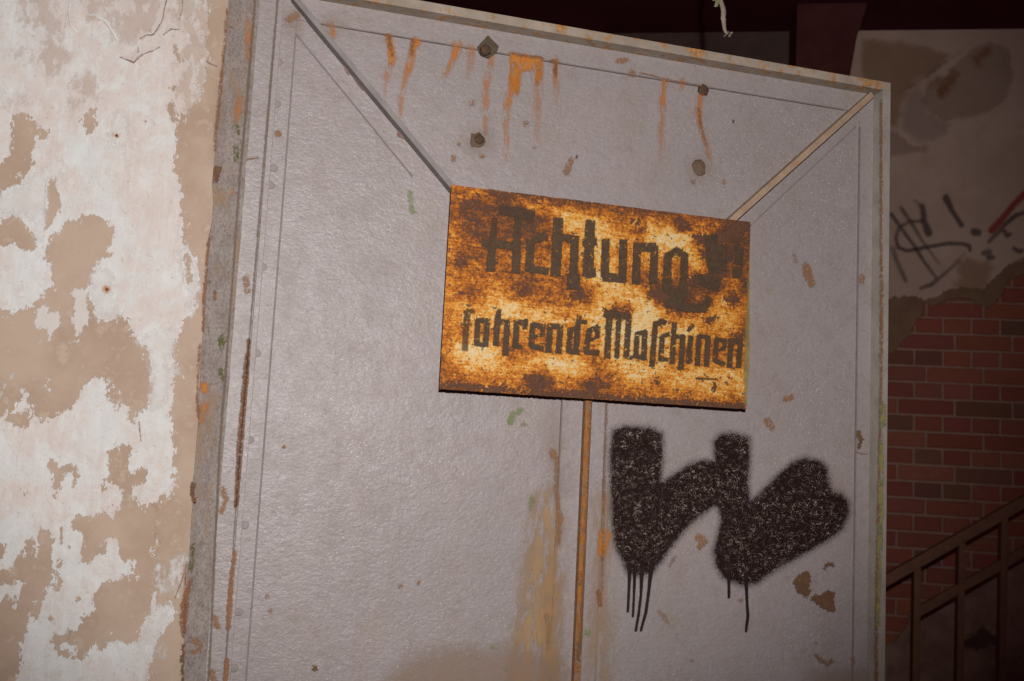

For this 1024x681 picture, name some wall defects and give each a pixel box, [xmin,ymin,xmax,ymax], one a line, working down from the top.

corrosion [386,34,419,87]
corrosion [506,53,557,107]
flaking render [0,0,229,681]
corrosion [183,0,299,681]
spalling [888,261,1024,354]
corrosion [511,449,563,681]
corrosion [576,399,610,662]
peeling [793,571,836,612]